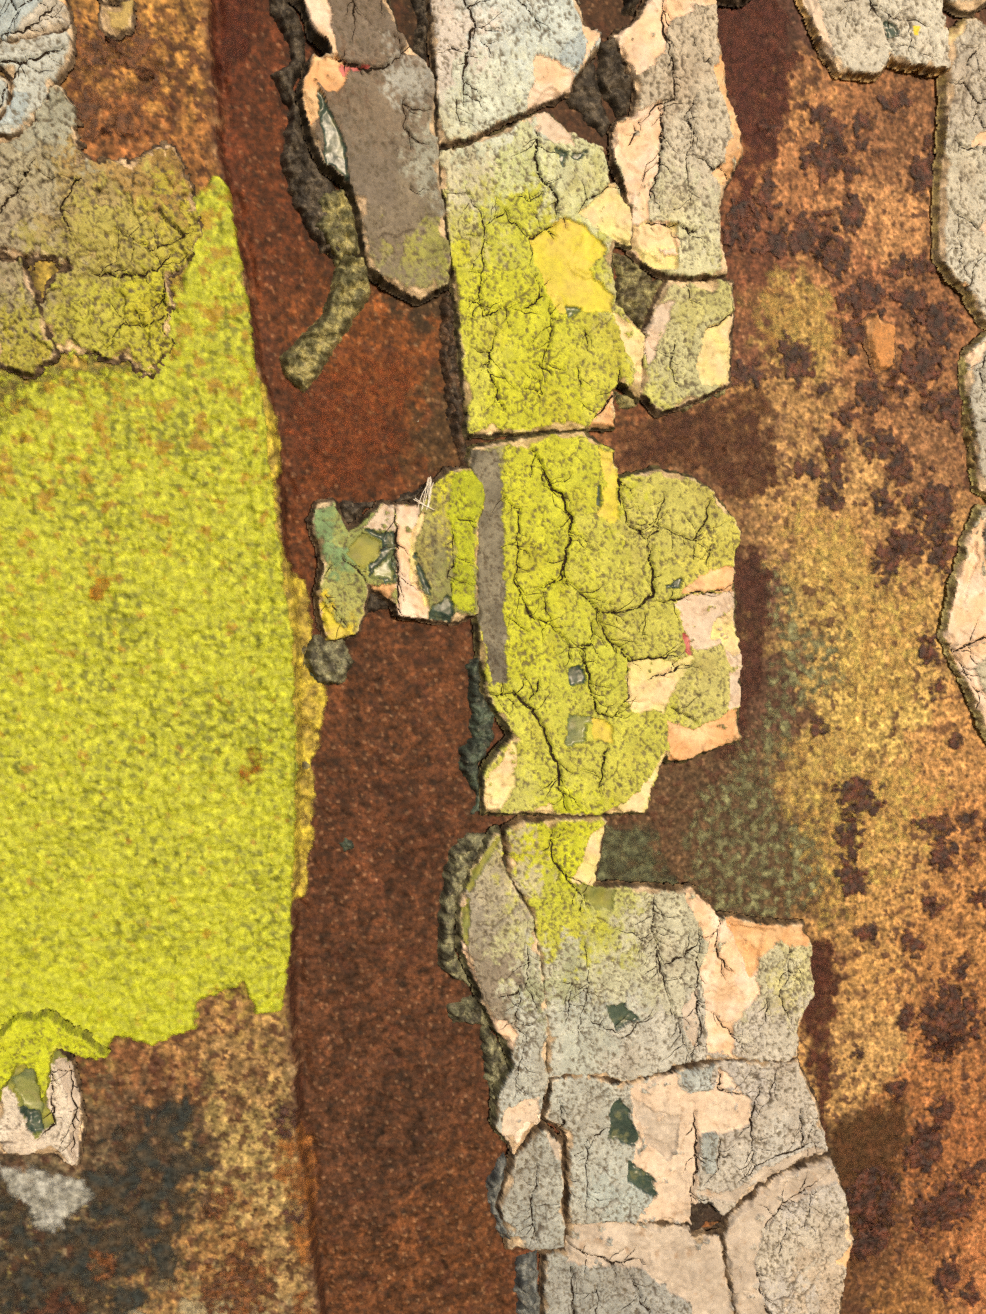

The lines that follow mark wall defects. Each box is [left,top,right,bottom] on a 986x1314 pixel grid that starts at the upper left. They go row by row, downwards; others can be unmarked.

peeling [0,0,204,314]
spalling [0,247,176,380]
rust [615,329,834,498]
rust [717,0,968,588]
peeling [793,0,986,745]
peeling [269,0,854,1314]
rust [722,545,773,760]
rust [832,767,888,903]
rust [853,896,946,959]
rust [912,809,986,879]
peeling [0,1007,111,1166]
rust [803,938,986,1276]